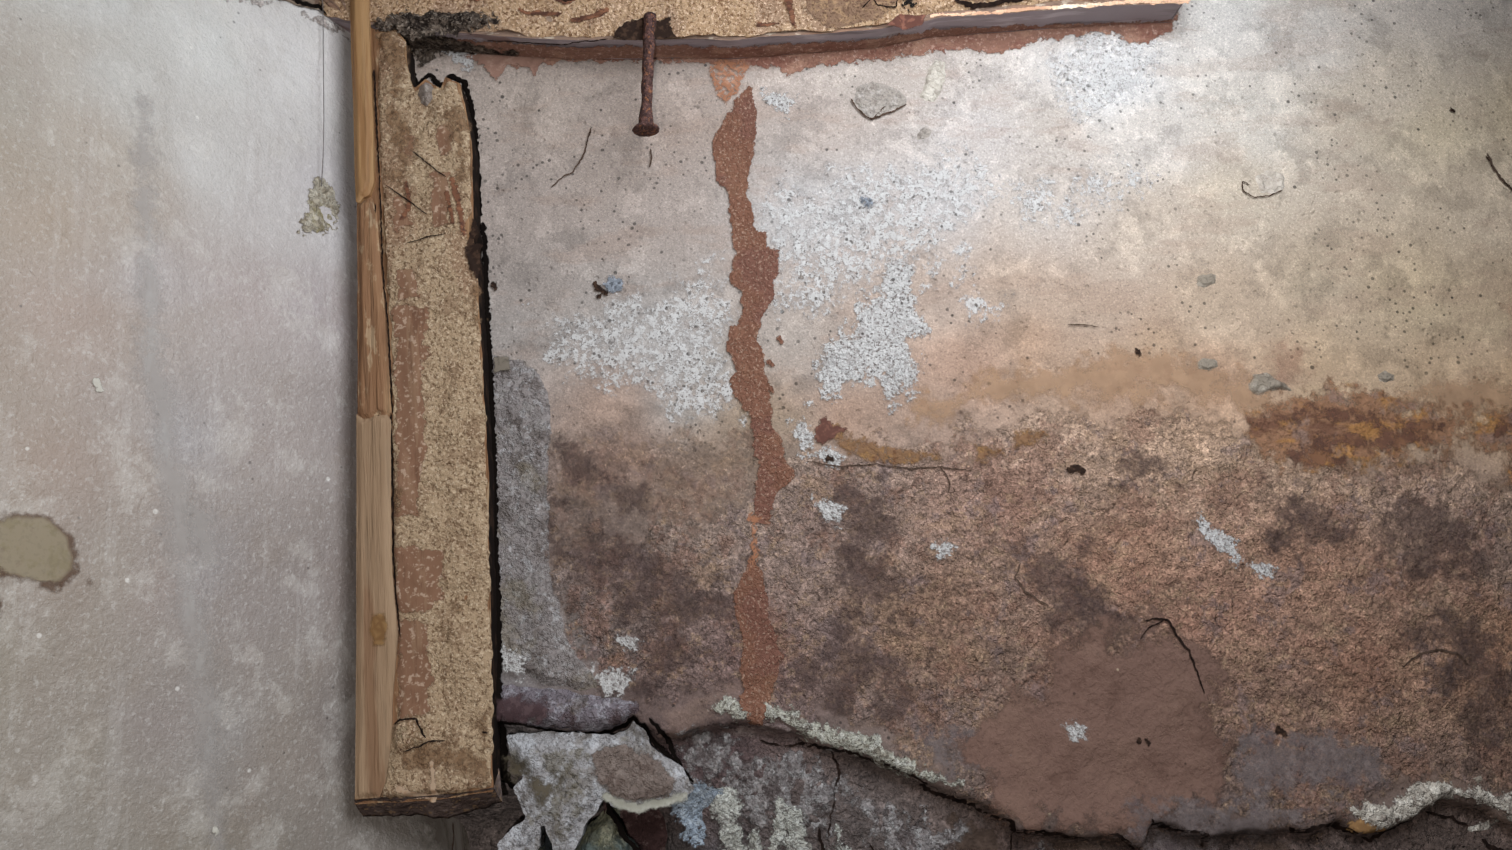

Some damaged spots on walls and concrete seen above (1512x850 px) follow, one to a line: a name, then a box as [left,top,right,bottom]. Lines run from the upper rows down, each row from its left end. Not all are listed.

damp [0,513,80,591]
rust [464,12,1179,726]
damp [543,143,1512,850]
rust [1245,378,1512,485]
crack [605,801,641,850]
spalling [454,696,1512,850]